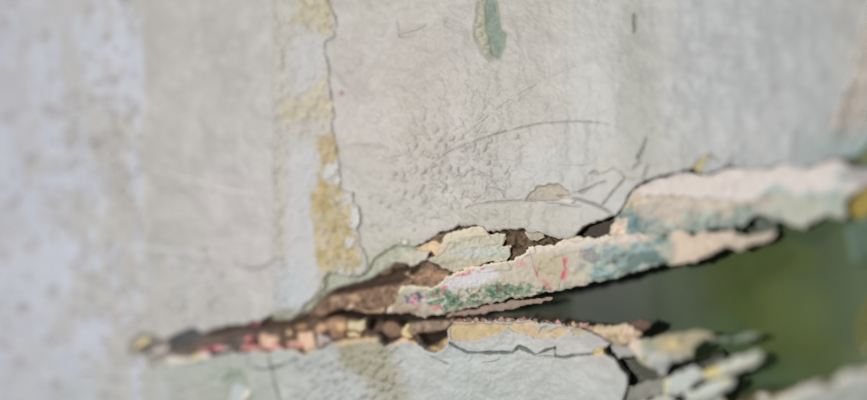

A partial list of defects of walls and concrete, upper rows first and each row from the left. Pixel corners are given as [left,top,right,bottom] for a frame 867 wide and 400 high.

peeling [473,0,509,63]
peeling [830,13,867,160]
peeling [273,0,369,311]
peeling [397,226,513,273]
peeling [525,231,545,241]
peeling [336,336,376,346]
peeling [428,316,762,400]